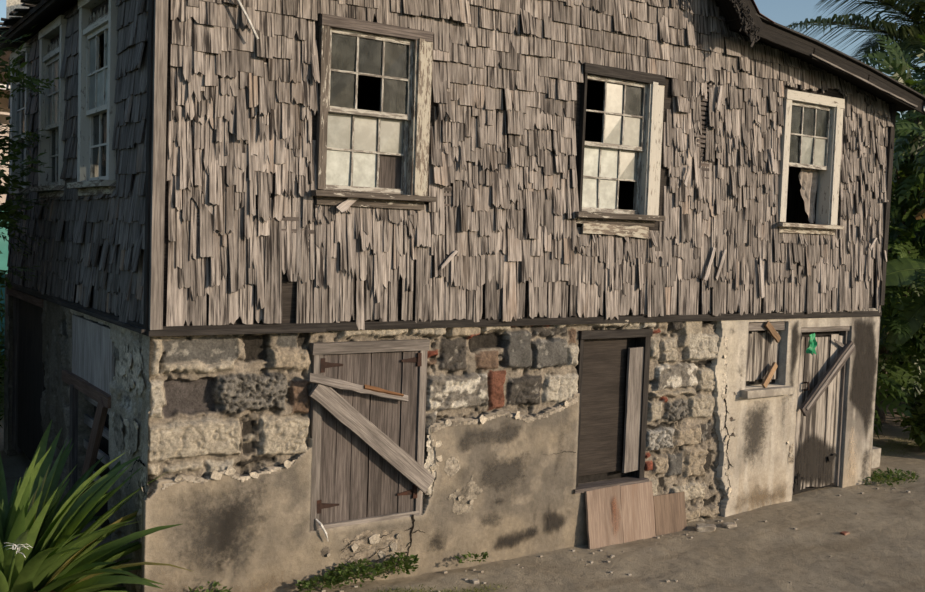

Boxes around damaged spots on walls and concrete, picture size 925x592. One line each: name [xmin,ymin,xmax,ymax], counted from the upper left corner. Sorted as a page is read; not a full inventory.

flaking render [117,344,145,395]
water stain [462,425,521,450]
spalling [720,336,738,498]
water stain [483,457,523,490]
water stain [192,485,265,567]
water stain [495,512,564,549]